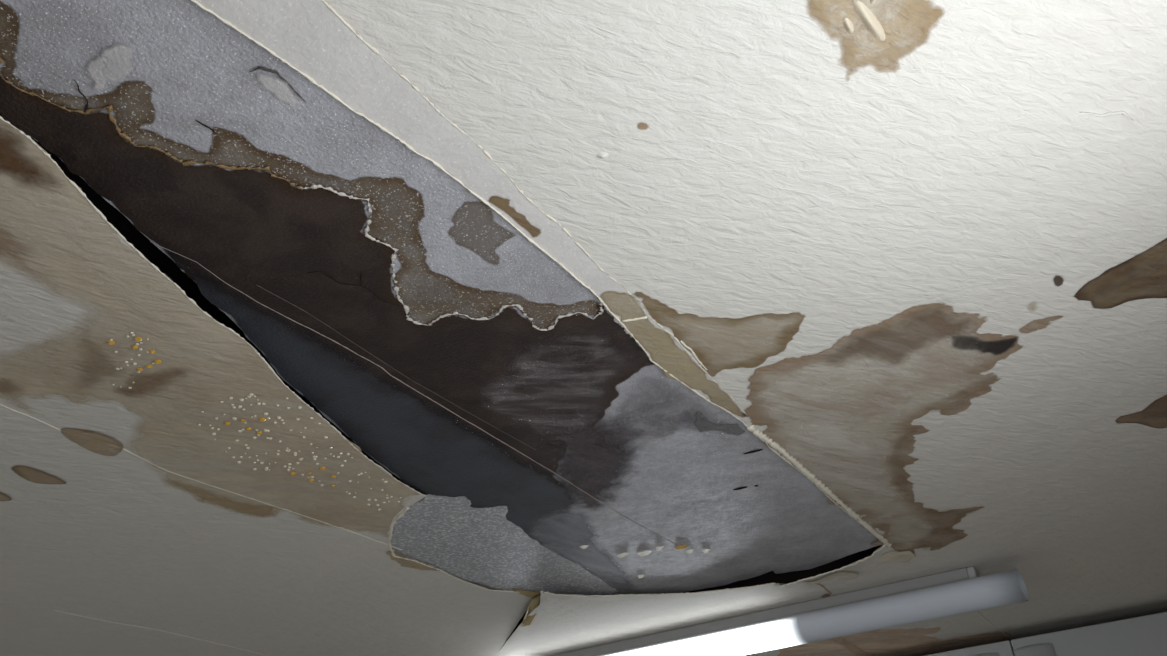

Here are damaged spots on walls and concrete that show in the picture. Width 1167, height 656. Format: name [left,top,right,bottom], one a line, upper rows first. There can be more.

leakage [809,0,943,73]
leakage [0,1,745,590]
peeling [0,0,915,653]
leakage [635,292,1063,553]
leakage [1074,238,1167,309]
leakage [1115,395,1167,429]